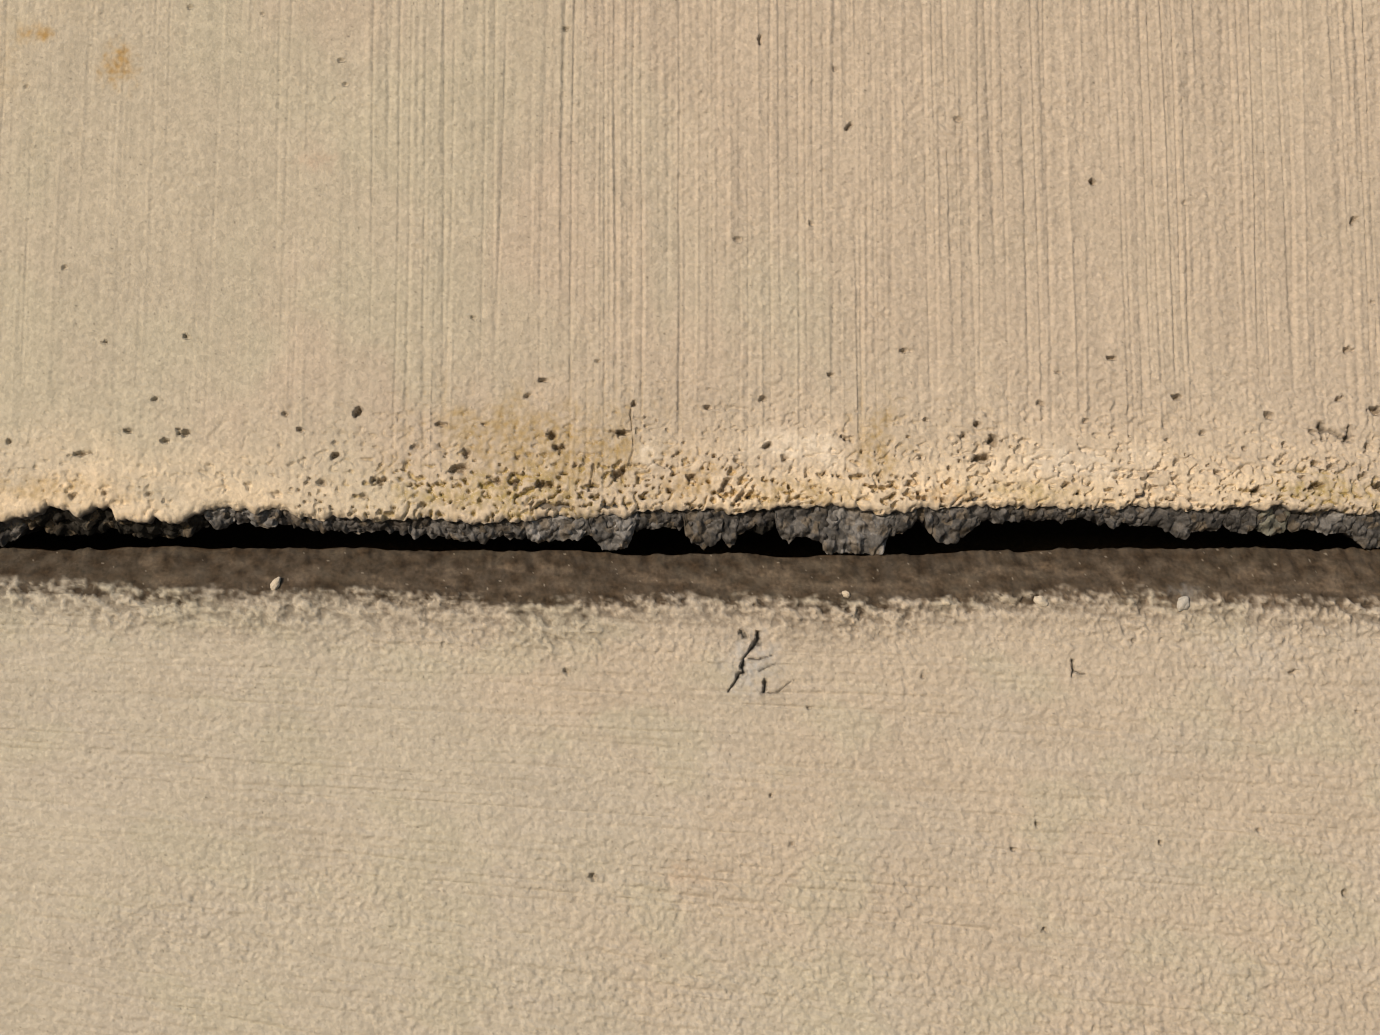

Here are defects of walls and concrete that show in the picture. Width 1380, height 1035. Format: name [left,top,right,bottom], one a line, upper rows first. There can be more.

spalling [1366,405,1380,417]
spalling [159,428,191,444]
spalling [545,429,578,469]
spalling [762,441,788,463]
spalling [957,421,1001,464]
spalling [1307,420,1371,450]
spalling [0,447,1380,556]
crack [727,627,795,697]